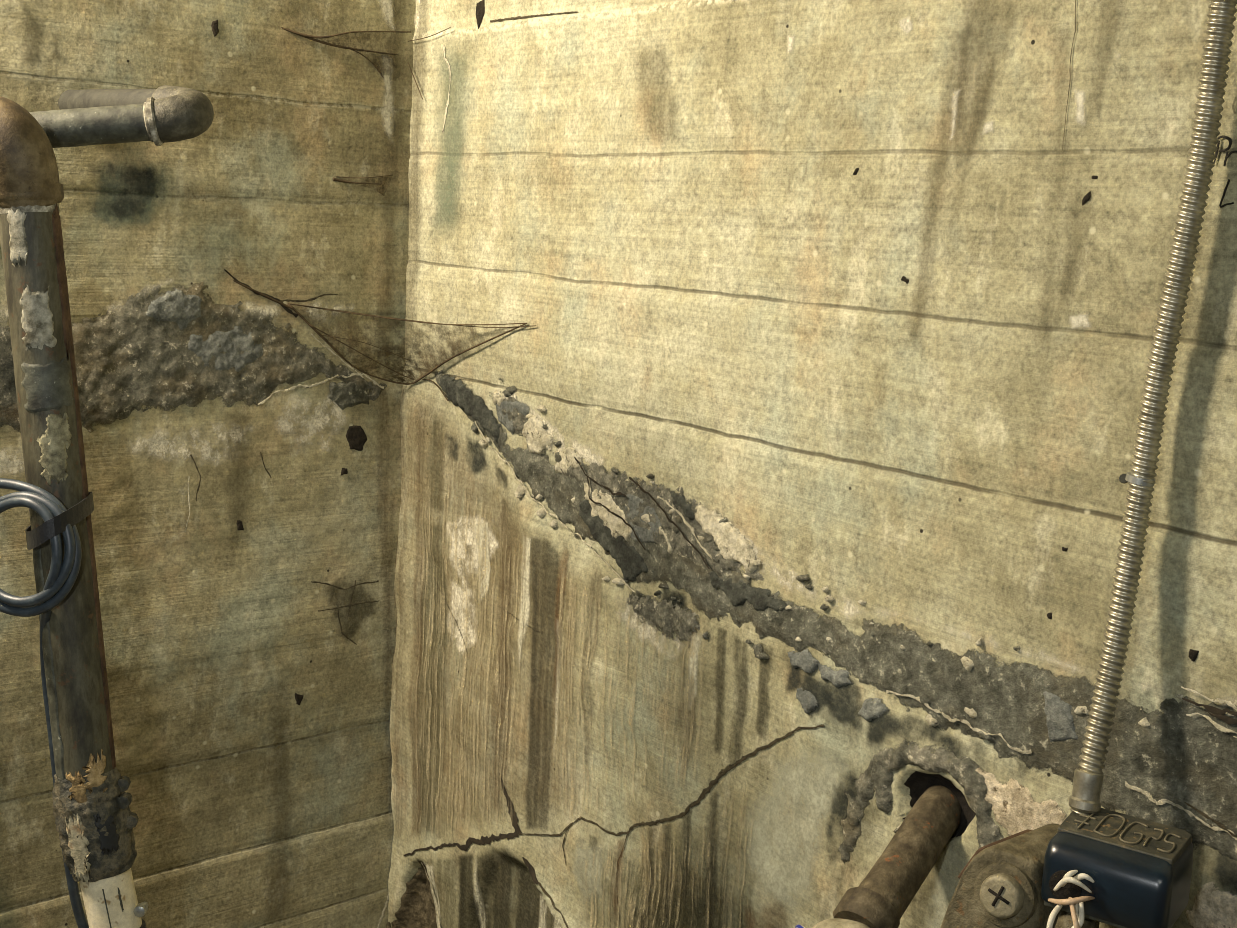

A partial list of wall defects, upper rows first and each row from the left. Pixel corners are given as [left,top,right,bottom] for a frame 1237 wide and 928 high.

peeling [0,285,57,433]
spalling [37,281,387,485]
damp [427,438,506,497]
spalling [377,860,441,928]
damp [426,851,561,928]
damp [417,487,659,831]
crack [404,724,824,928]
damp [715,635,766,764]
spalling [435,370,1095,928]
damp [827,774,857,837]
damp [787,663,960,757]
spalling [1100,686,1237,861]